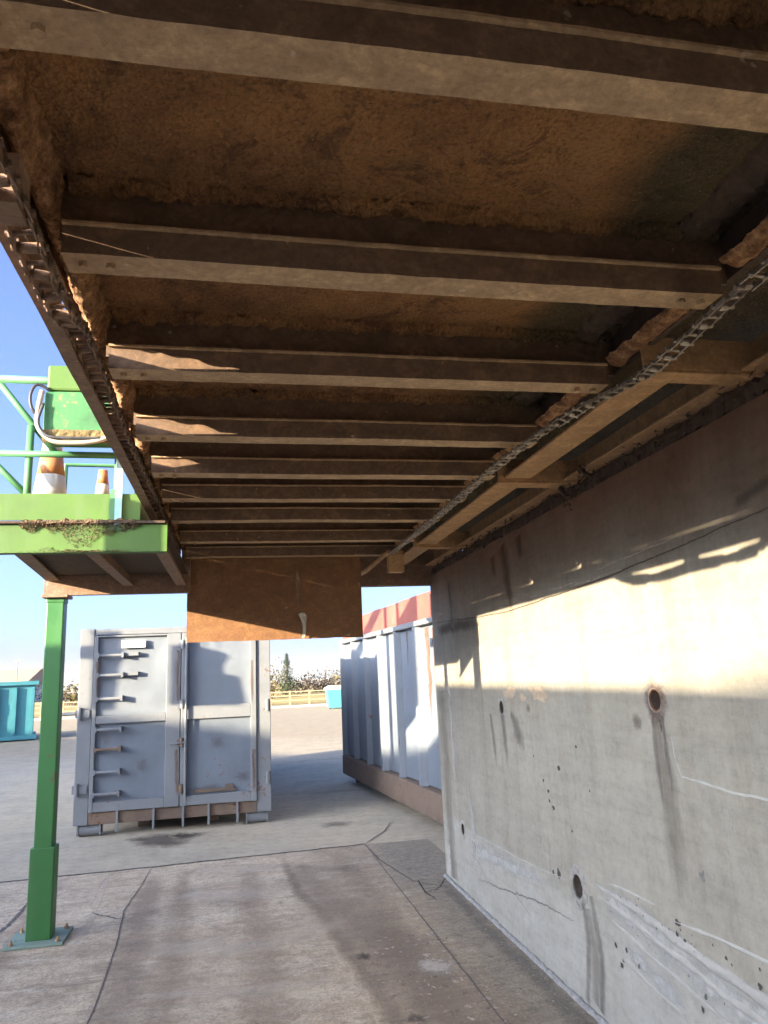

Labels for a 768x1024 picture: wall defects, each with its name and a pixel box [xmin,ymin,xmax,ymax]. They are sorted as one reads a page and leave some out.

crack [659,719,768,801]
crack [468,830,573,921]